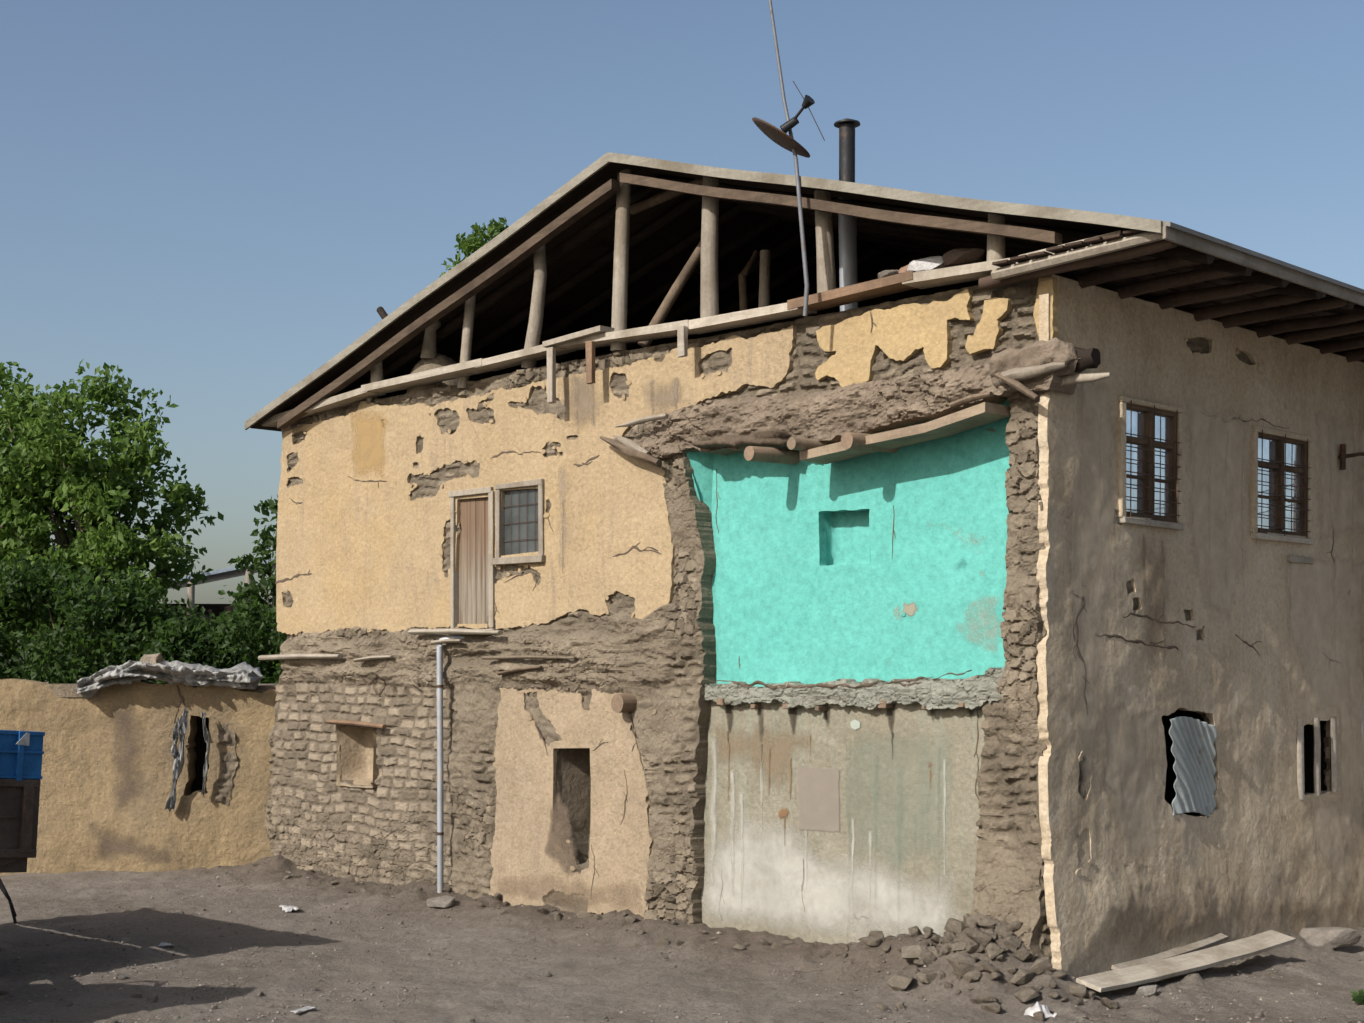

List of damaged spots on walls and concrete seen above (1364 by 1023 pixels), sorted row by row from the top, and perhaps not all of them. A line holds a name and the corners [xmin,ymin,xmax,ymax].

spalling [652,347,669,363]
spalling [697,348,732,379]
spalling [610,373,632,400]